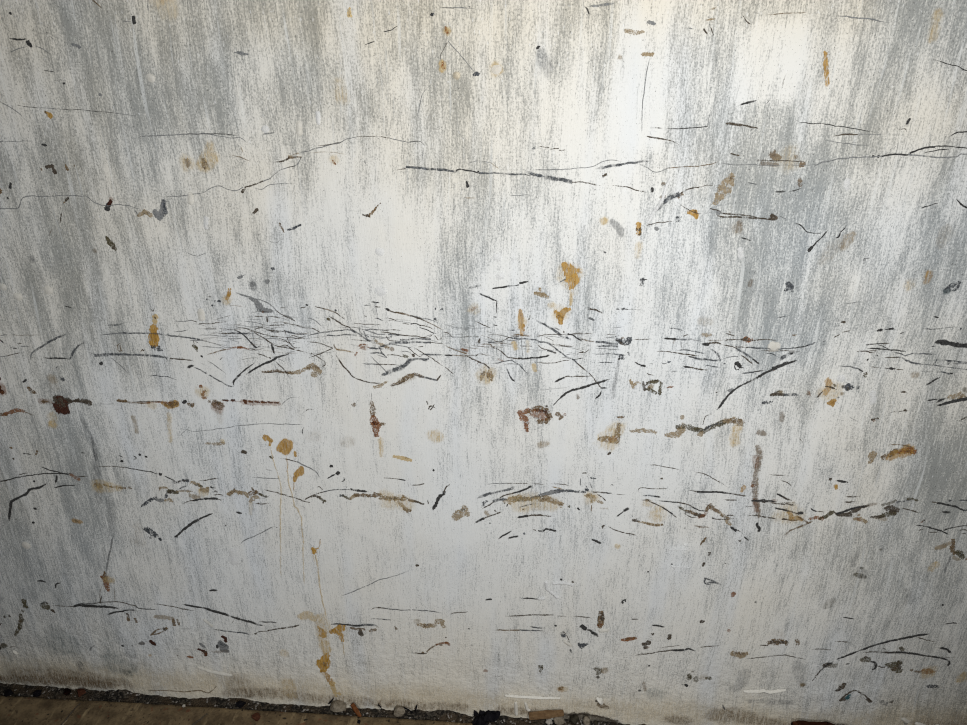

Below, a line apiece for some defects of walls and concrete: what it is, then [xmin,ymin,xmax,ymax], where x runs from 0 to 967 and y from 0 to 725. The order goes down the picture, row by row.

crack [642,64,785,143]
crack [142,118,967,252]
rust [554,262,581,325]
crack [0,281,967,421]
rust [27,387,92,428]
rust [369,393,386,451]
rust [517,405,566,432]
crack [0,447,175,521]
rust [262,435,304,491]
rust [868,444,917,464]
crack [38,580,298,635]
crack [622,599,957,681]